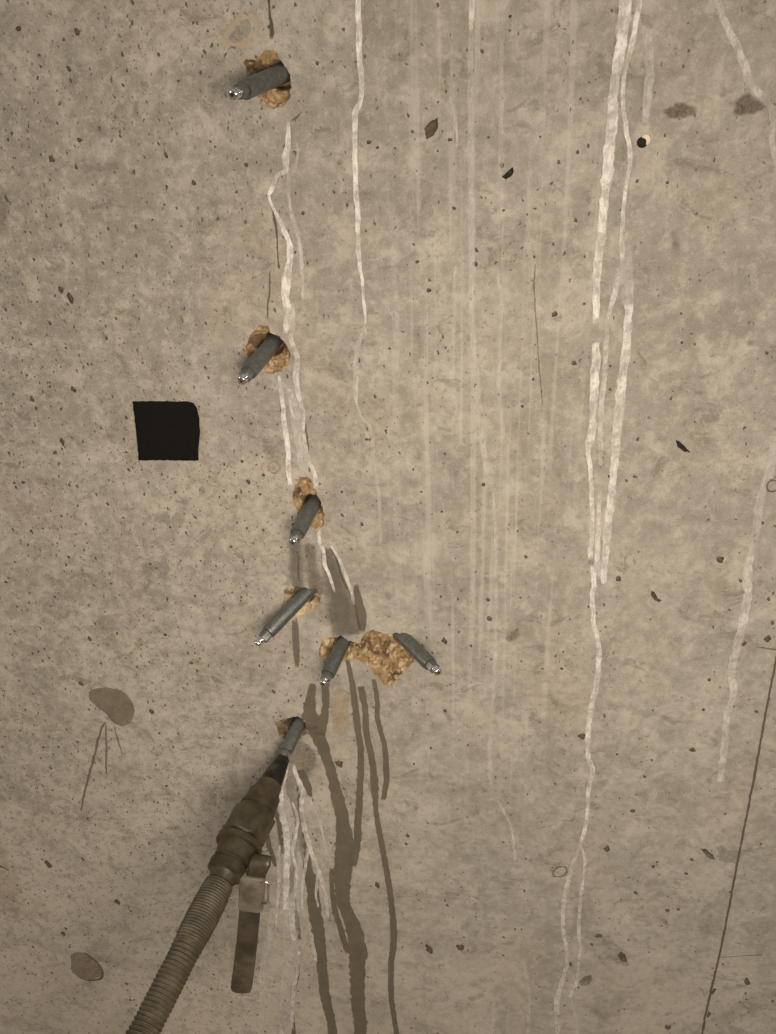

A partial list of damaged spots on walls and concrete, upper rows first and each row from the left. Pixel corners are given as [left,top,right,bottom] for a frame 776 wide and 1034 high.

crack [266,0,274,37]
efflorescence [719,15,750,72]
damp [735,89,763,114]
efflorescence [352,0,367,323]
crack [267,203,279,316]
crack [303,424,311,461]
efflorescence [553,0,642,1034]
crack [331,549,361,628]
efflorescence [737,557,754,633]
damp [266,661,399,1034]
crack [701,647,776,1034]